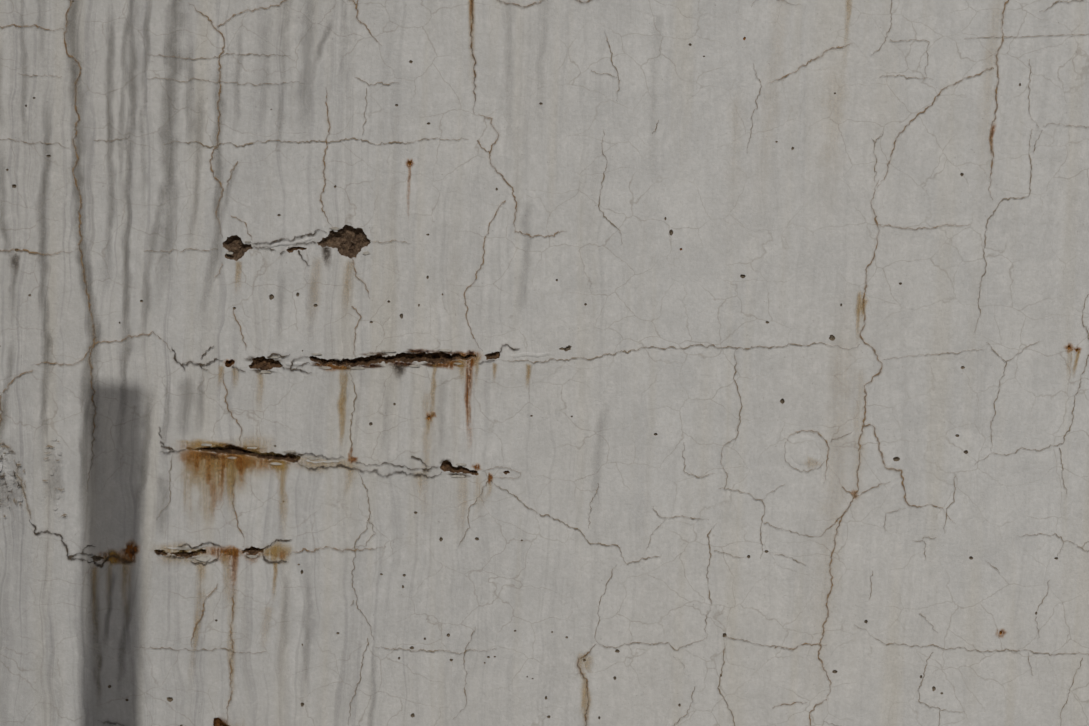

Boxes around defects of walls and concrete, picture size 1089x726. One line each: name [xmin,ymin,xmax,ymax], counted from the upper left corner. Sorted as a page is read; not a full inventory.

spalling [223,235,253,261]
spalling [286,225,371,259]
crack [0,0,498,722]
spalling [249,356,283,373]
spalling [302,349,500,370]
crack [459,0,1089,726]
corrosion [314,349,478,421]
corrosion [186,441,297,481]
corrosion [104,542,138,564]
corrosion [211,547,287,576]